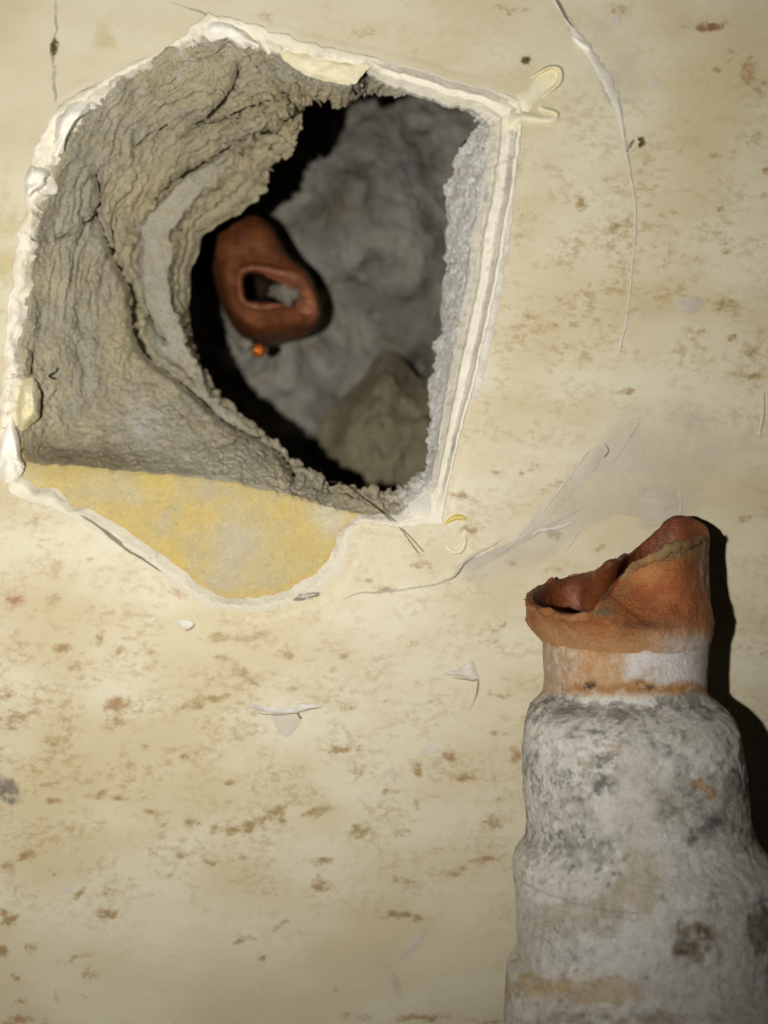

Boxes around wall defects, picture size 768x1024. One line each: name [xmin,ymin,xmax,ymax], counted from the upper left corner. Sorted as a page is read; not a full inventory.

flaking render [0,11,523,613]
rust [619,536,709,581]
rust [524,599,605,623]
peeling [249,703,324,734]